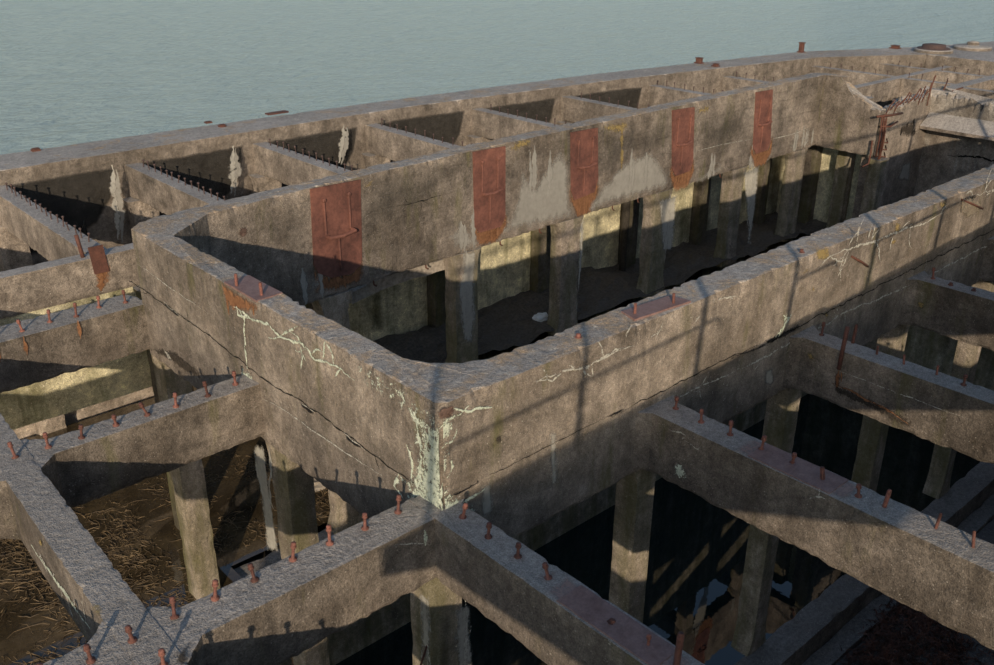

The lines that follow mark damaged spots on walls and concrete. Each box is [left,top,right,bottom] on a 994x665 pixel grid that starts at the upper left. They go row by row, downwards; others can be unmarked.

crack [948,155,994,195]
corrosion [570,185,598,217]
corrosion [475,217,506,245]
crack [483,206,994,478]
crack [129,265,418,483]
spalling [439,406,454,419]